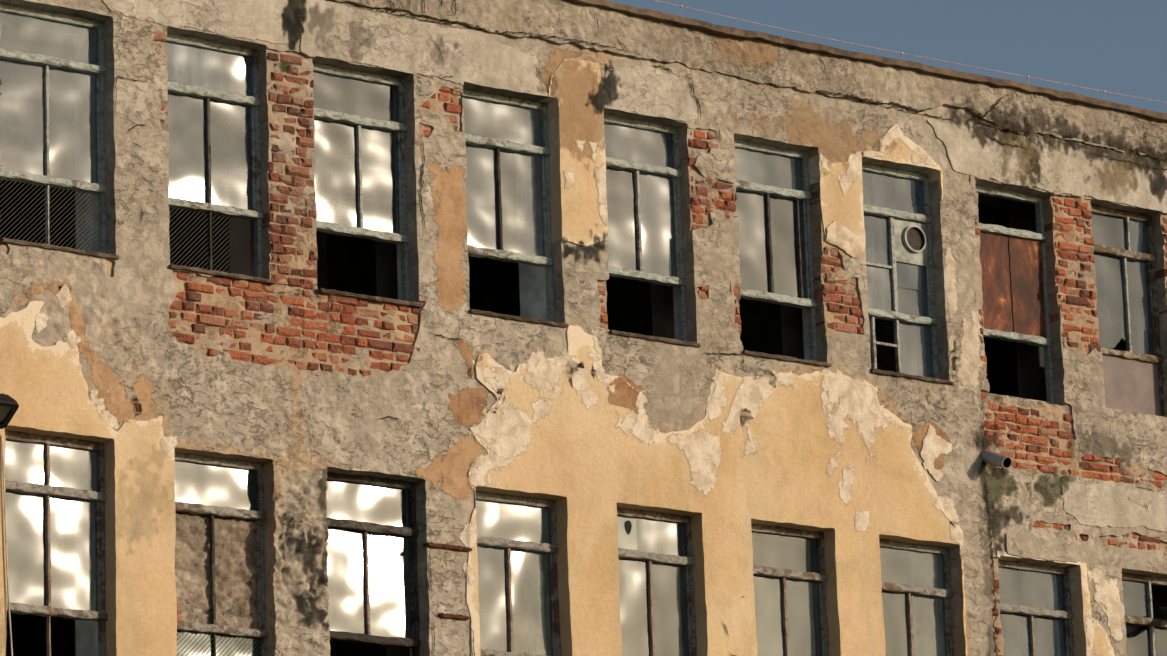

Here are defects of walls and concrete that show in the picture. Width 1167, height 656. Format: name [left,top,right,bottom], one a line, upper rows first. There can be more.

spalling [603,66,698,124]
crack [808,56,1028,149]
flaking render [678,127,737,234]
water stain [950,98,1167,201]
crack [1076,130,1167,170]
flaking render [551,239,586,328]
flaking render [597,281,608,329]
flaking render [813,247,864,340]
flaking render [927,119,1167,476]
flaking render [981,390,1167,492]
water stain [319,469,328,509]
flaking render [911,424,1167,656]